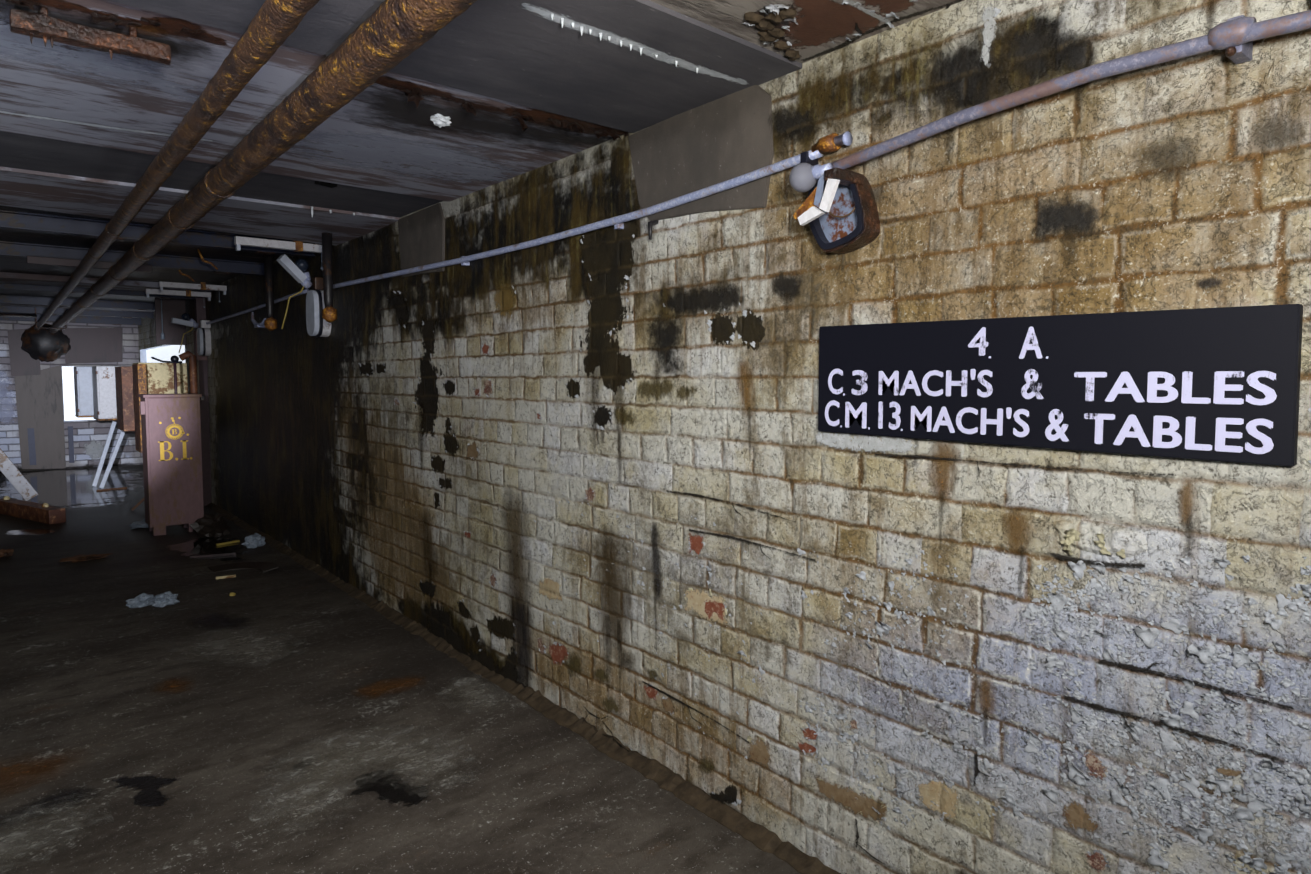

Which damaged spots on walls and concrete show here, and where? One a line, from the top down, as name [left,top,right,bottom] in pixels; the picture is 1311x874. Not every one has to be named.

peeling [743,0,918,61]
leakage [387,291,409,328]
leakage [638,283,743,400]
leakage [419,501,530,706]
peeling [797,550,1311,874]
leakage [269,736,450,816]